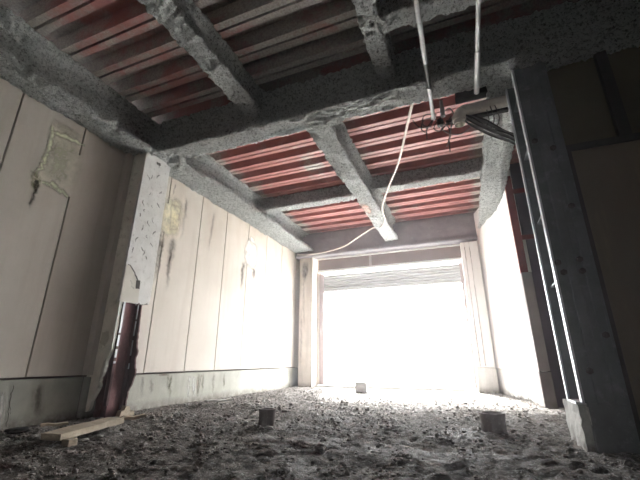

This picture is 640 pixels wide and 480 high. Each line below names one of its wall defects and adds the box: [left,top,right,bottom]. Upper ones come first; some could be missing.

peeling [86,331,109,407]